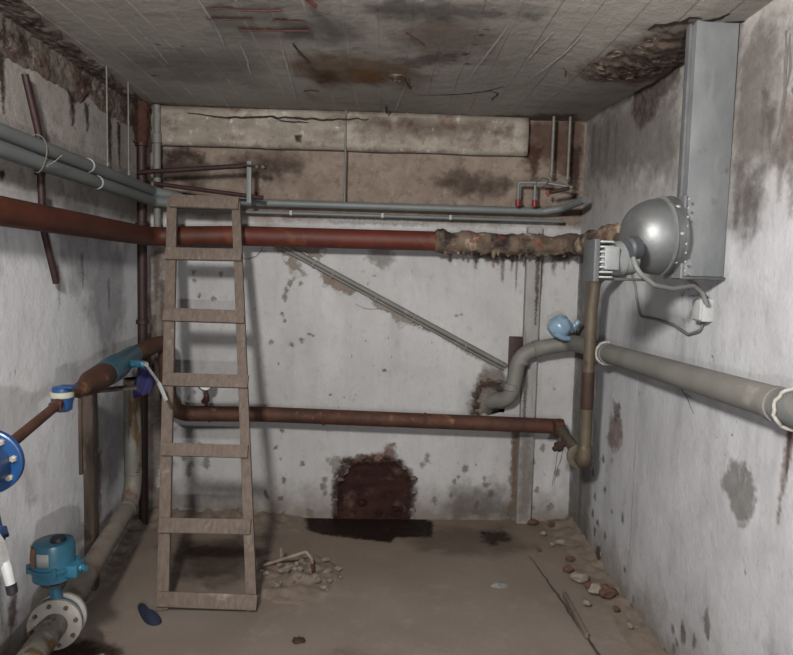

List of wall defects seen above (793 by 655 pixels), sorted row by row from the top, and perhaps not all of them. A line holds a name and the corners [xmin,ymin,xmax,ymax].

spalling [0,0,142,165]
crack [190,113,369,123]
spalling [582,22,694,124]
water stain [734,29,774,171]
spalling [472,378,503,415]
spalling [320,443,418,519]
water stain [723,462,754,520]
water stain [50,640,120,655]